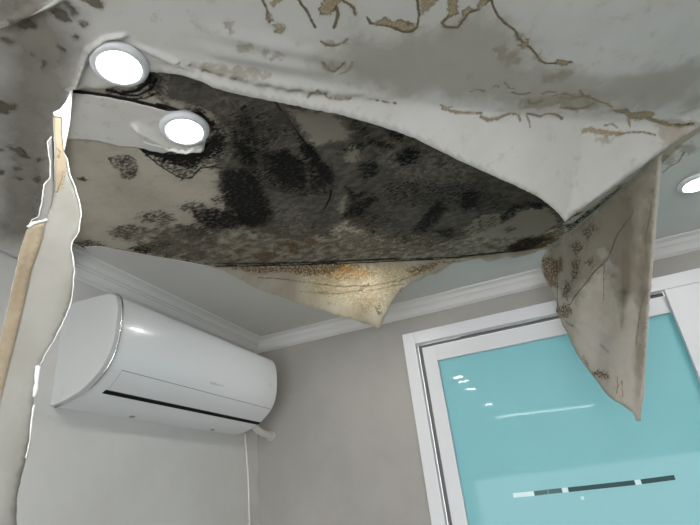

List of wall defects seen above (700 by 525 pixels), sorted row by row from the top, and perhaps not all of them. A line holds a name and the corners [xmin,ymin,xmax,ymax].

damp [0,0,582,294]
damp [563,223,596,300]